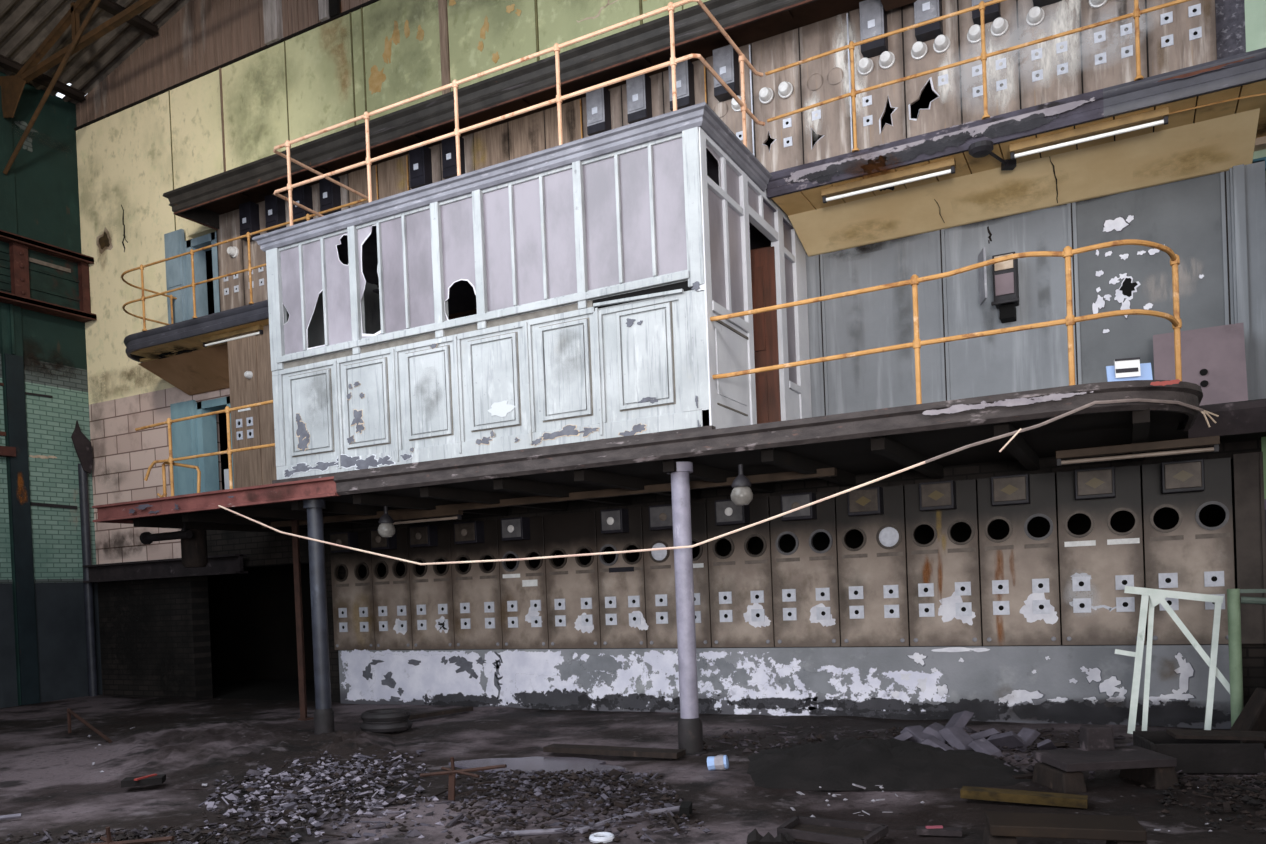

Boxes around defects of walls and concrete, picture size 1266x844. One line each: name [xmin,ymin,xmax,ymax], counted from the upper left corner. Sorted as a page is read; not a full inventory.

peeling [778,97,1095,187]
crack [1049,156,1058,203]
peeling [1102,215,1134,233]
peeling [1092,244,1165,334]
peeling [284,381,414,478]
peeling [475,400,515,445]
rust [923,563,942,591]
peeling [340,649,680,713]
spalling [696,647,1231,727]